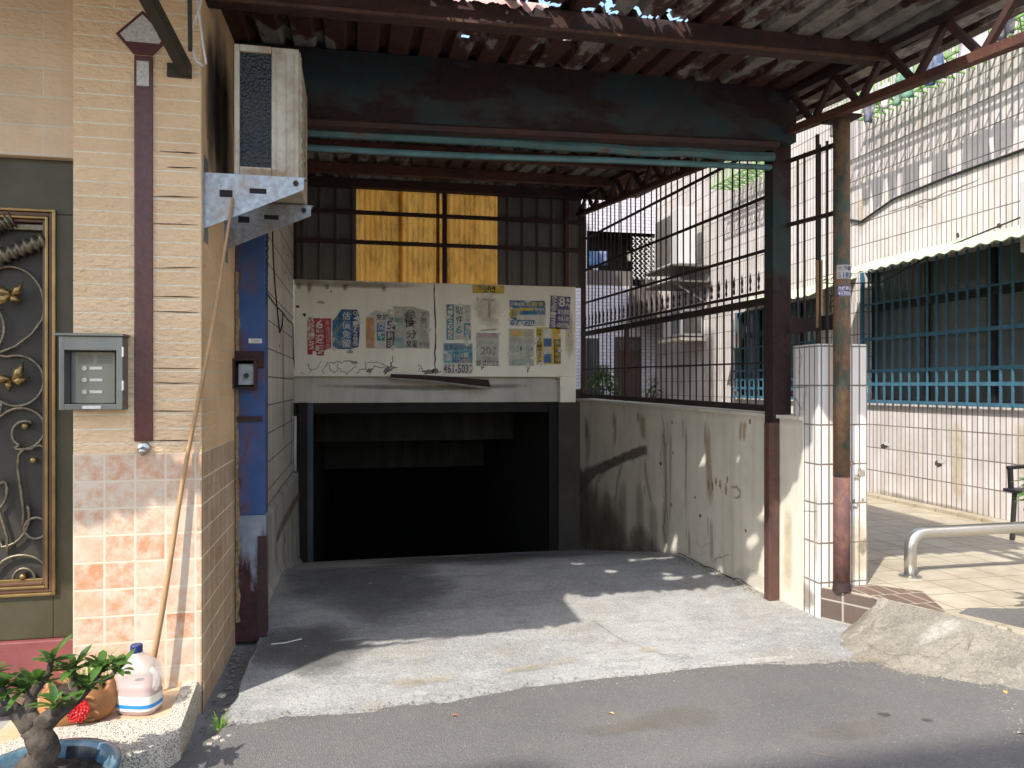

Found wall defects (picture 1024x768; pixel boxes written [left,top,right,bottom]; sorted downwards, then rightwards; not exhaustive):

crack [160,151,195,168]
crack [156,296,200,313]
crack [301,285,436,375]
crack [156,368,200,384]
leakage [580,446,647,490]